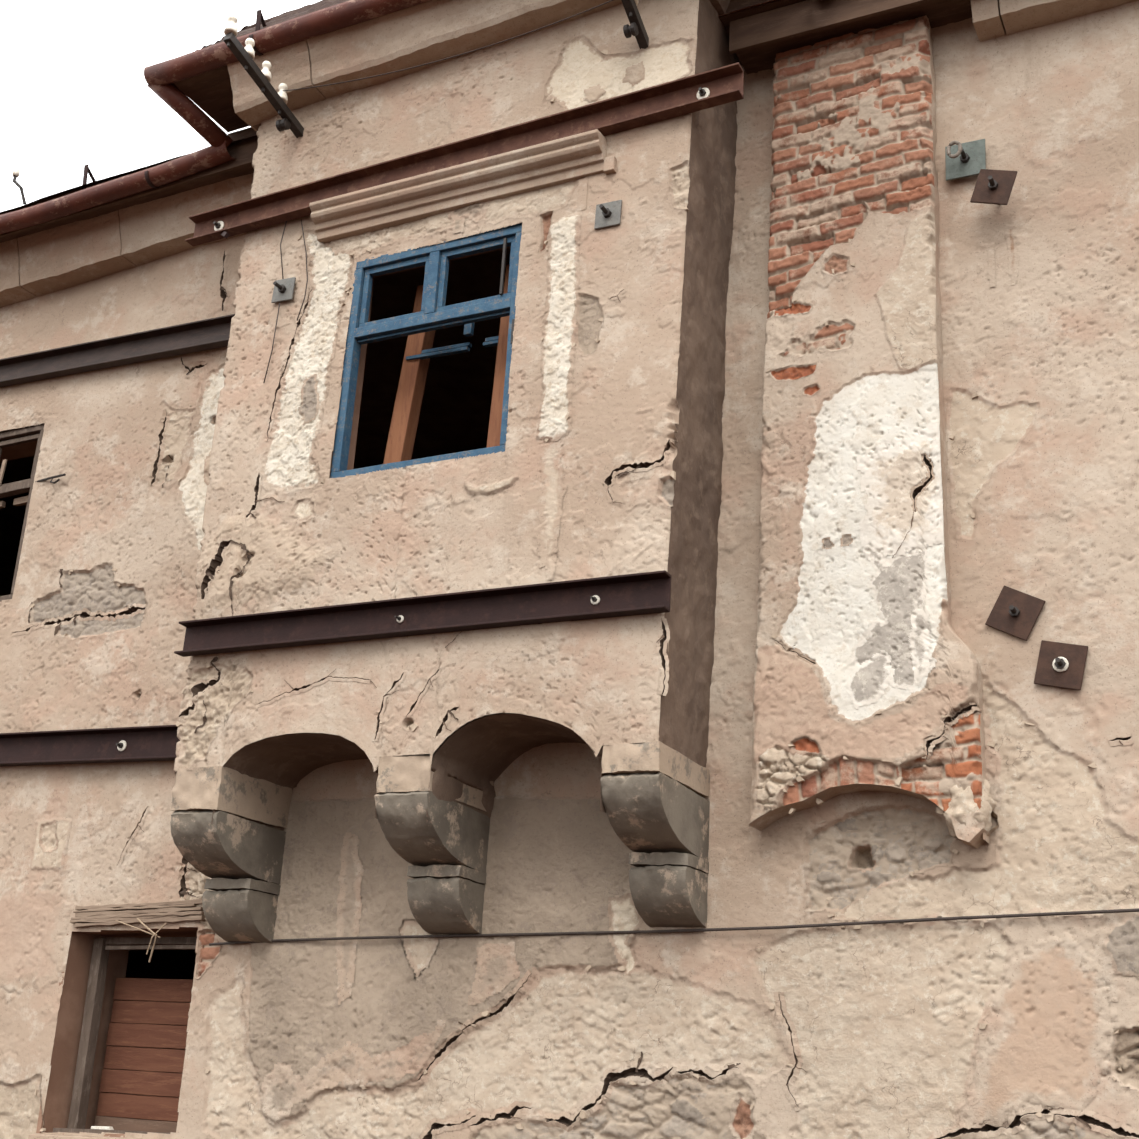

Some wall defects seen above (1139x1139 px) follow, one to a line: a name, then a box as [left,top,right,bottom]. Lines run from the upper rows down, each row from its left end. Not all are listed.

flaking render [767,15,936,320]
peeling [261,179,604,524]
peeling [151,360,225,557]
crack [199,472,285,616]
crack [601,439,677,504]
peeling [766,319,1039,723]
crack [892,453,935,558]
spalling [176,660,253,771]
peeling [201,673,1139,1139]
crack [414,969,536,1086]
crack [418,1052,743,1139]
crack [932,1104,1139,1139]